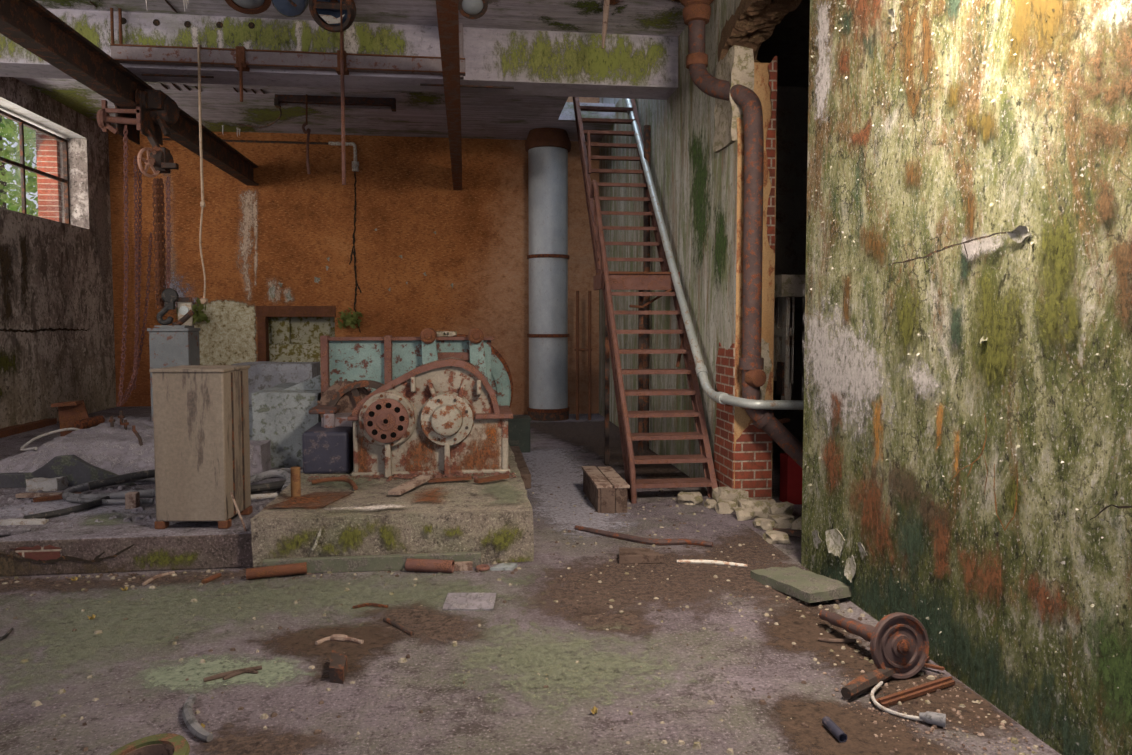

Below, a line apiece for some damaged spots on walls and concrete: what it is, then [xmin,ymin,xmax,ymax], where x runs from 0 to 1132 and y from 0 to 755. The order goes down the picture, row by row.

spalling [718,0,915,254]
efflorescence [237,190,258,300]
crack [0,326,89,334]
rust [823,393,904,569]
rust [927,501,1012,605]
peeling [938,429,1047,519]
crack [1090,504,1132,532]